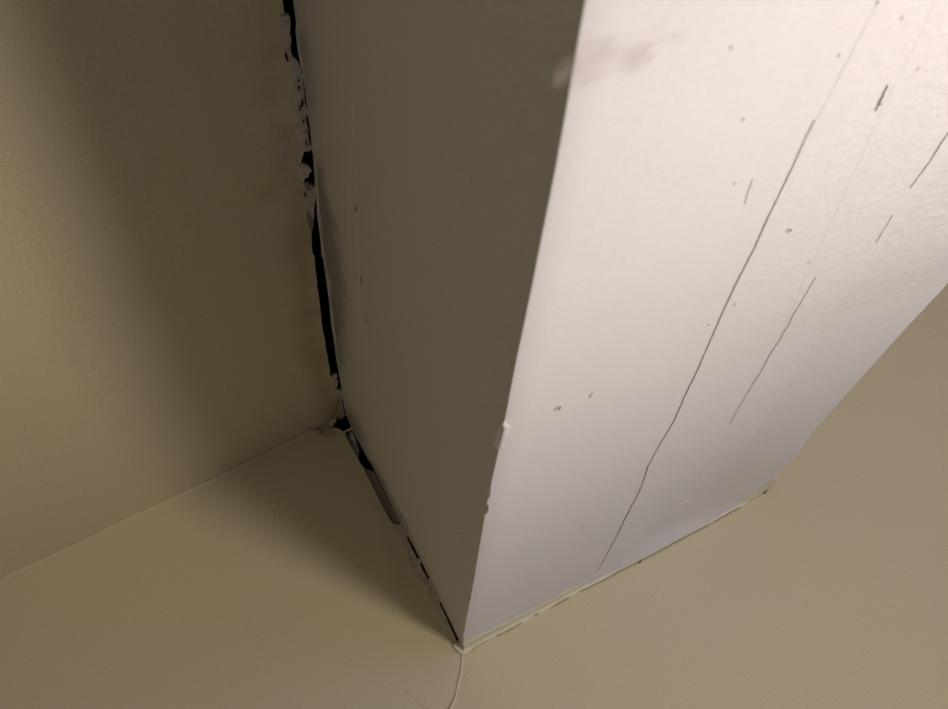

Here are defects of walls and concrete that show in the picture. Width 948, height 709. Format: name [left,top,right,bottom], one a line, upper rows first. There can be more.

crack [404,120,816,709]
crack [910,133,948,188]